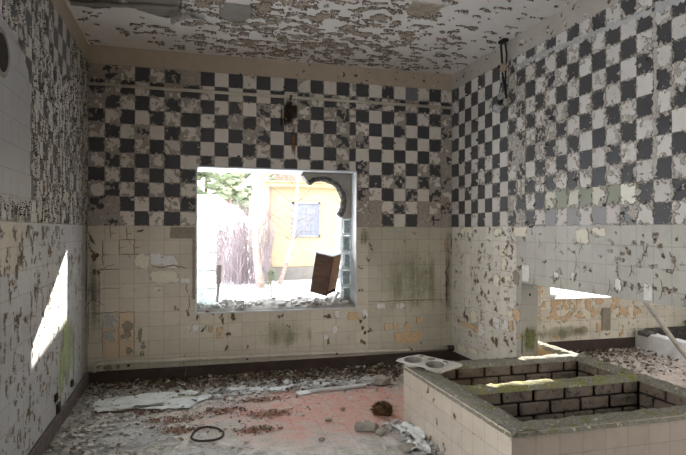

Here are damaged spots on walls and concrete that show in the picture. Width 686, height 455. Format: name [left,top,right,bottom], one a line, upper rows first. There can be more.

peeling [0,0,221,455]
spalling [68,0,686,357]